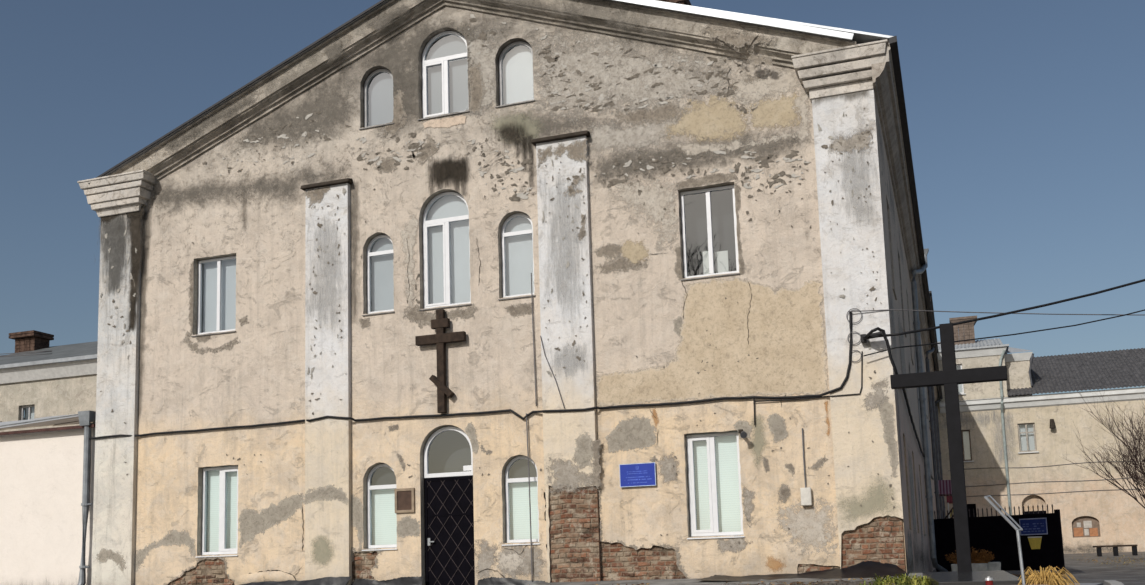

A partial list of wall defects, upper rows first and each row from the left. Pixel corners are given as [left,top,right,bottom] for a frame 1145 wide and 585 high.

damp [429,158,467,192]
peeling [467,23,809,275]
peeling [817,123,873,209]
damp [100,169,357,413]
flaking render [505,288,588,377]
flaking render [674,247,684,280]
spalling [165,555,235,585]
spalling [351,547,383,582]
spalling [474,439,689,582]
spalling [797,484,914,574]